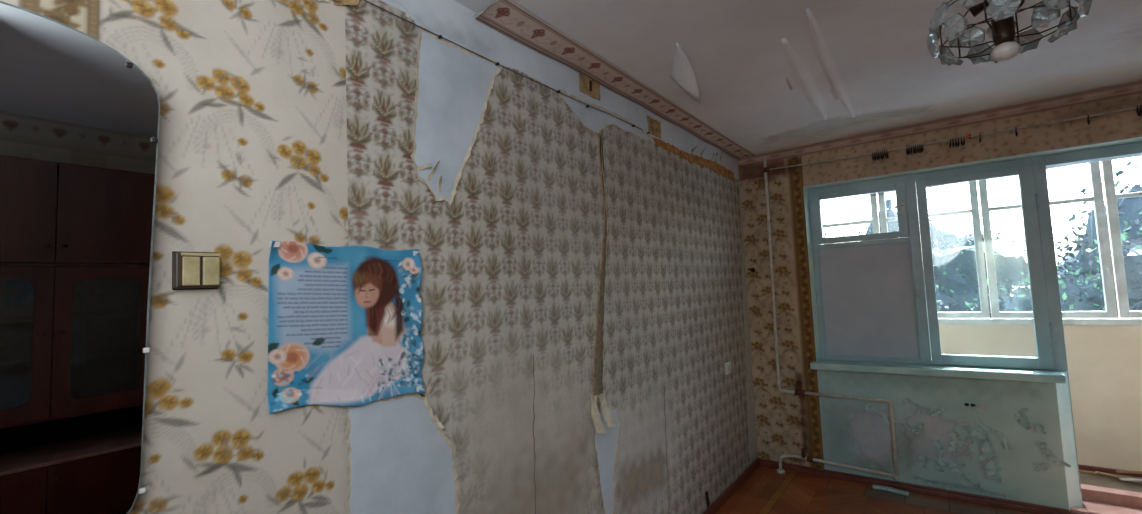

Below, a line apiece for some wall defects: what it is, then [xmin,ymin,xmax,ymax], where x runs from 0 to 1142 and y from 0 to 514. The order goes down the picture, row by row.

peeling [390,0,735,206]
peeling [344,377,460,514]
peeling [595,404,622,514]